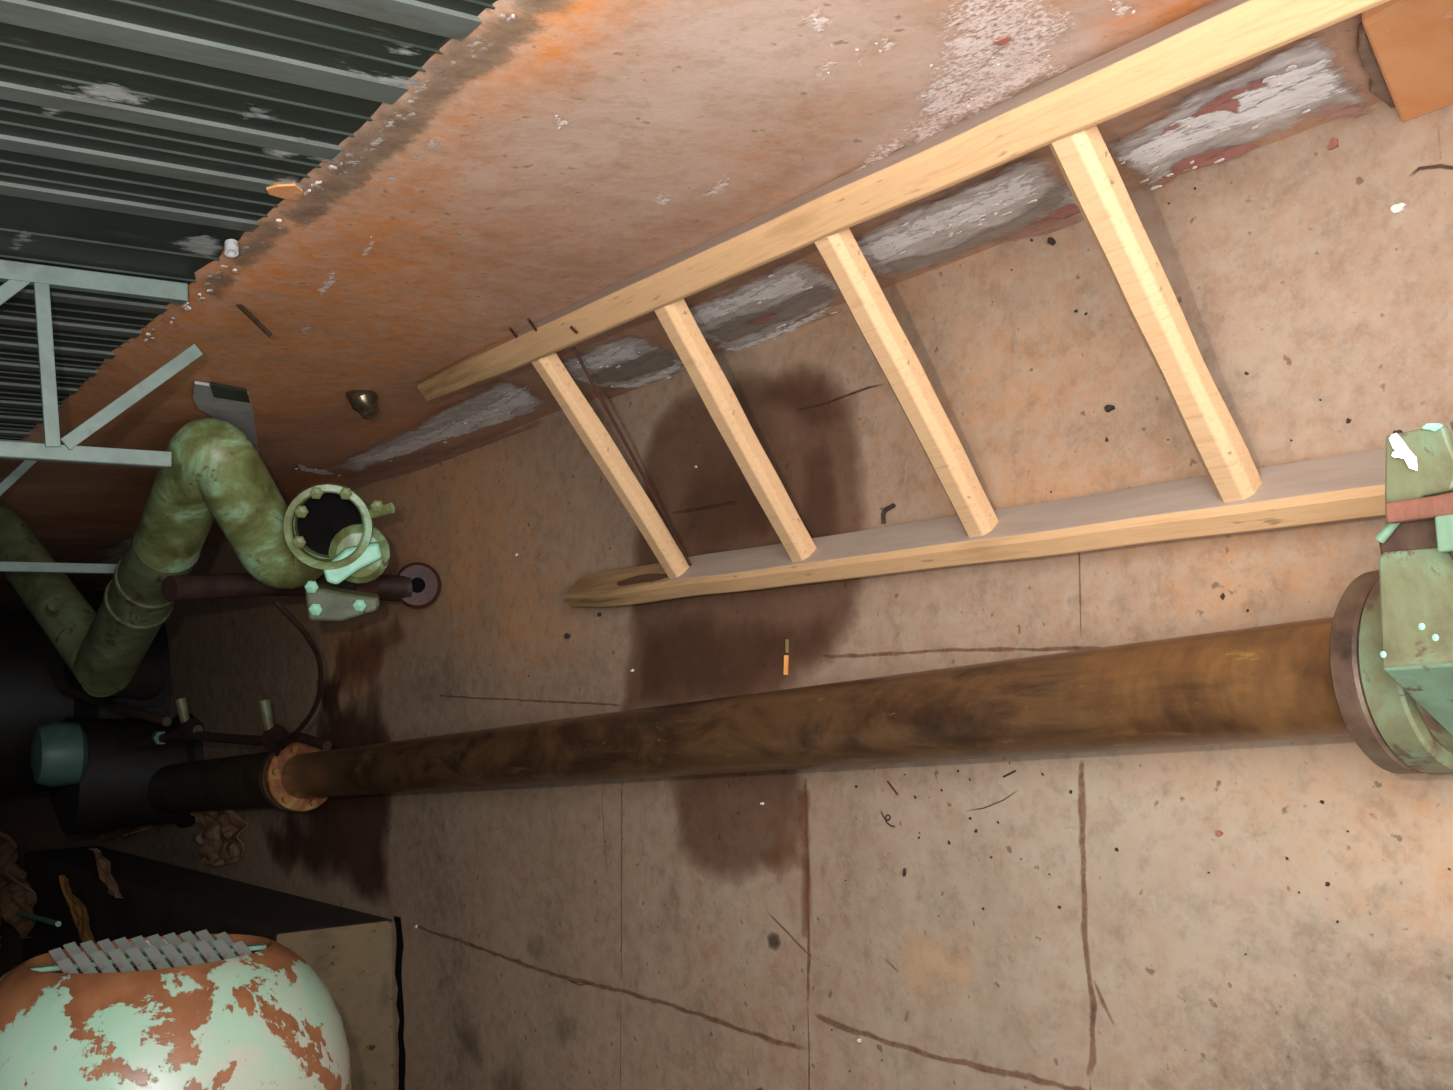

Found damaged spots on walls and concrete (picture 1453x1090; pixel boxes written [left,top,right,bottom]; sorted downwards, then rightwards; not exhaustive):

damp [804,10,828,32]
peeling [70,83,147,104]
damp [856,0,1070,171]
spalling [144,0,563,342]
peeling [295,383,546,481]
damp [647,401,782,557]
damp [734,378,877,538]
damp [639,535,659,566]
damp [630,579,853,703]
damp [681,770,794,868]
crack [417,764,1106,1090]